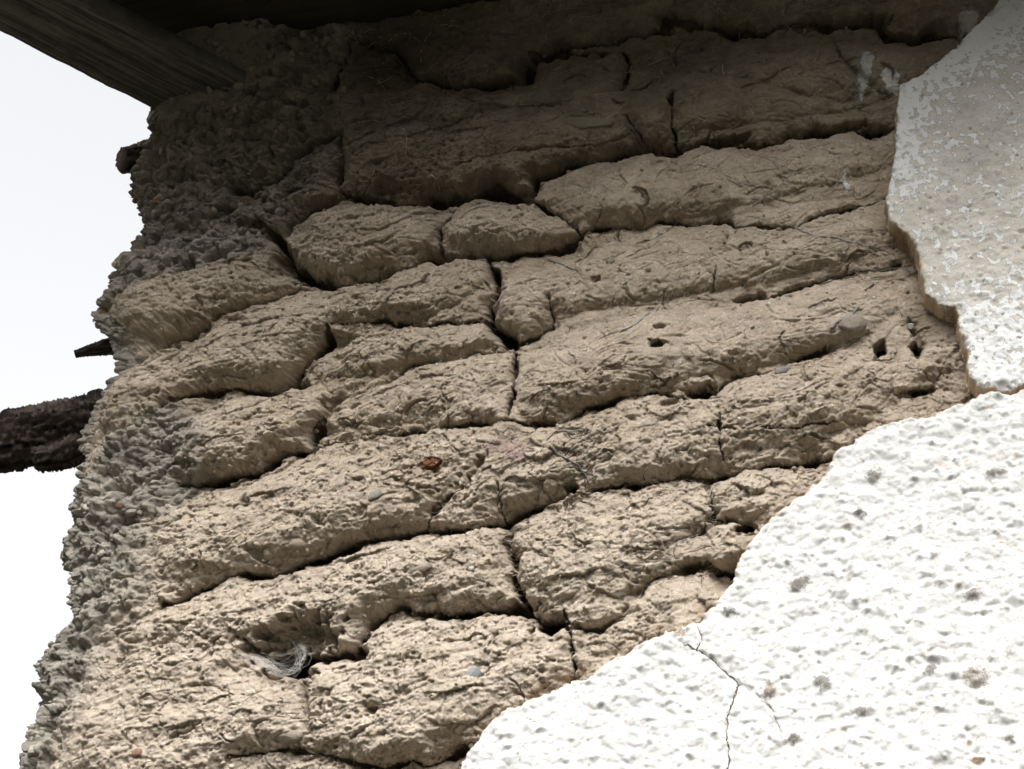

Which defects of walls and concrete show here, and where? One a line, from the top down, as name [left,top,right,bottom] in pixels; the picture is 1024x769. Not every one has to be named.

crack [479,16,967,92]
crack [667,93,831,158]
flaking render [884,0,1024,398]
crack [252,220,337,292]
crack [302,166,688,437]
crack [796,345,828,363]
crack [167,388,265,403]
crack [181,418,332,489]
crack [575,386,840,579]
crack [161,471,577,684]
crack [684,626,784,769]
crack [225,742,474,769]